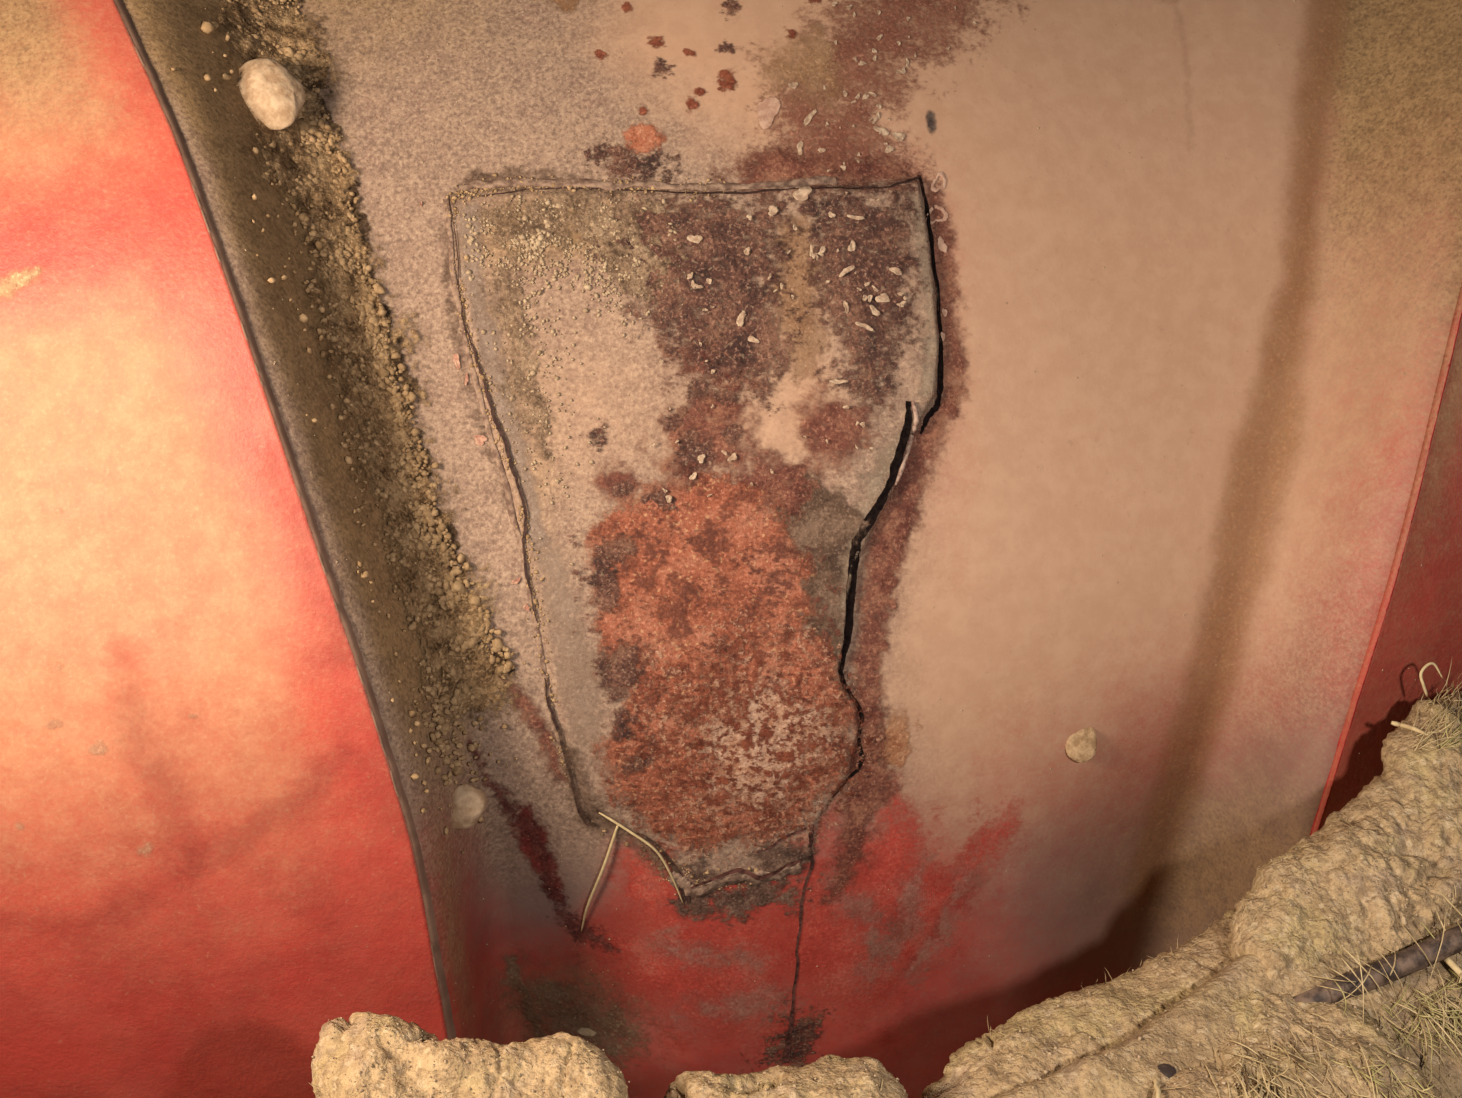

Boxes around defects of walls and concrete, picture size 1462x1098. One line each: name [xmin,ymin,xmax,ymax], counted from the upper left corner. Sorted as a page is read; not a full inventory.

peeling [757,82,798,129]
peeling [797,86,905,172]
peeling [746,206,778,221]
peeling [792,186,812,201]
peeling [926,171,948,253]
peeling [687,272,712,289]
peeling [809,240,908,331]
peeling [736,311,759,343]
peeling [689,450,737,480]
rust [458,0,988,952]
crack [443,168,944,1063]
rust [760,997,830,1067]